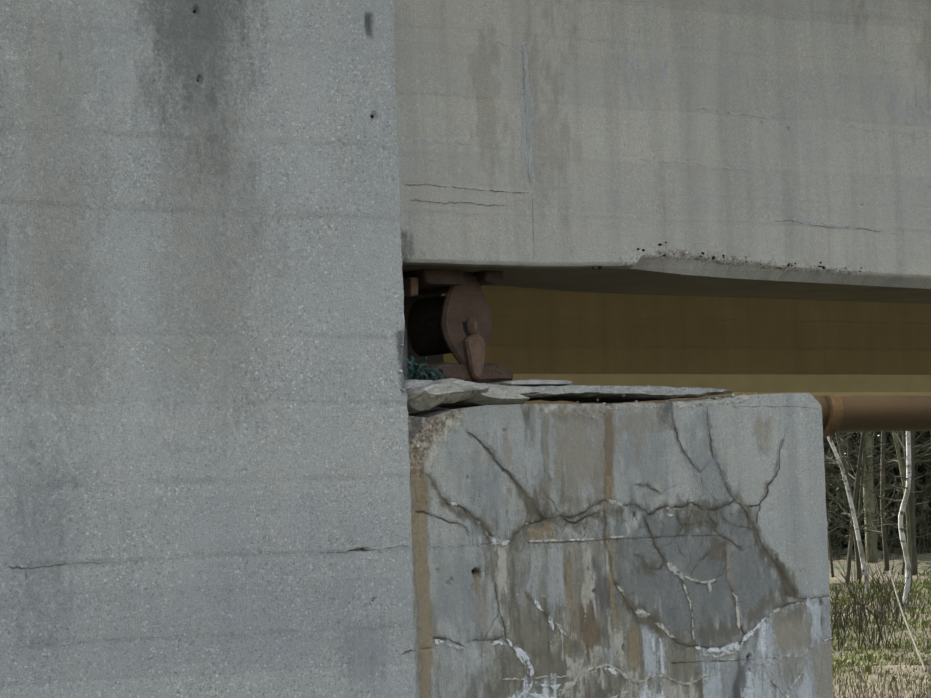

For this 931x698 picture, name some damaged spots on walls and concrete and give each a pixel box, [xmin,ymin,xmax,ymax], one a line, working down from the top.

crack [406,169,534,222]
spalling [618,242,872,275]
spalling [408,410,463,473]
corrosion [604,404,613,510]
corrosion [410,450,436,698]
corrosion [494,534,508,602]
corrosion [565,537,618,666]
crack [402,402,830,698]
leakage [503,501,823,698]